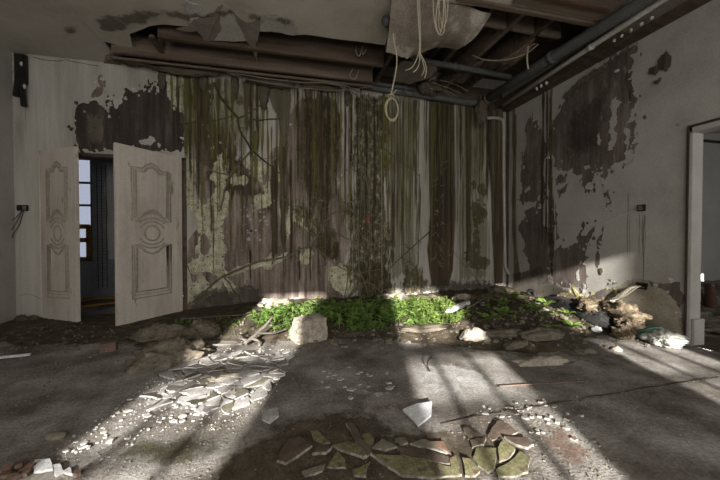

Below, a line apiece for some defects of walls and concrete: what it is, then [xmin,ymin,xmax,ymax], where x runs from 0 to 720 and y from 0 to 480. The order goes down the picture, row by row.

peeling [176,1,299,65]
peeling [67,74,356,310]
water stain [193,251,262,309]
water stain [170,74,579,300]
peeling [518,43,647,299]